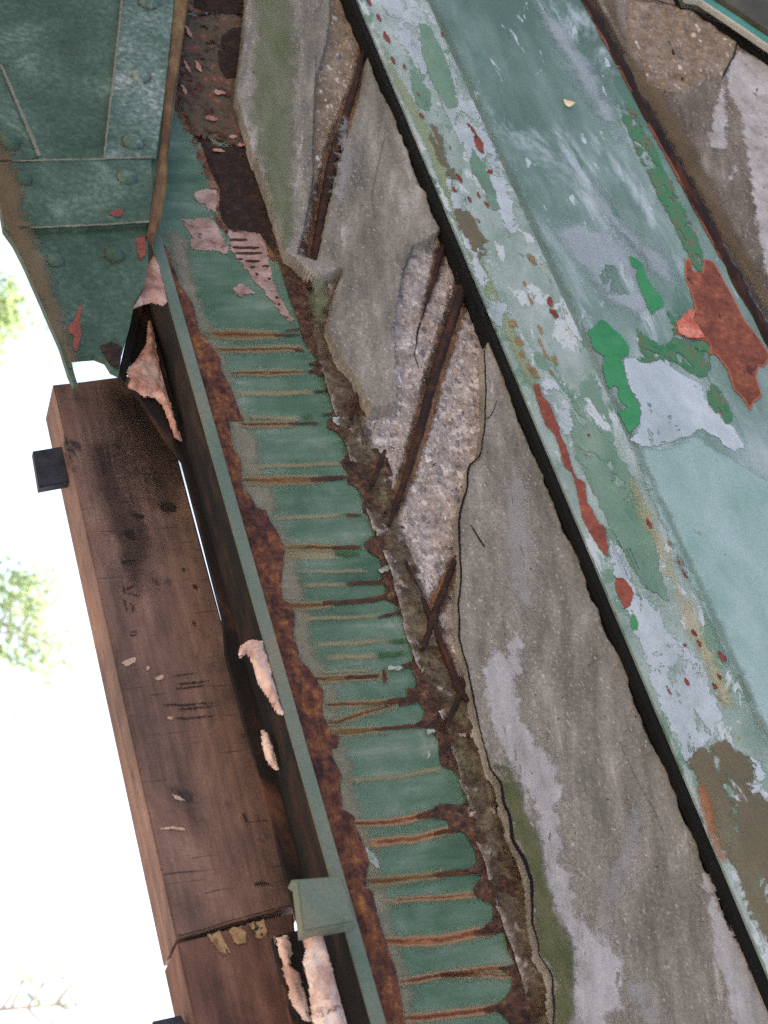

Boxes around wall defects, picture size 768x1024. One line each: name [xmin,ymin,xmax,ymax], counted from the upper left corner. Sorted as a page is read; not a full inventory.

spalling [298,0,365,260]
peeling [367,0,519,234]
rust [0,136,83,366]
peeling [166,188,295,382]
rust [163,0,548,1024]
spalling [319,238,488,821]
peeling [457,224,512,331]
rust [509,319,608,556]
peeling [588,256,744,451]
crack [457,339,555,1024]
peeling [609,539,768,941]
peeling [208,919,267,954]